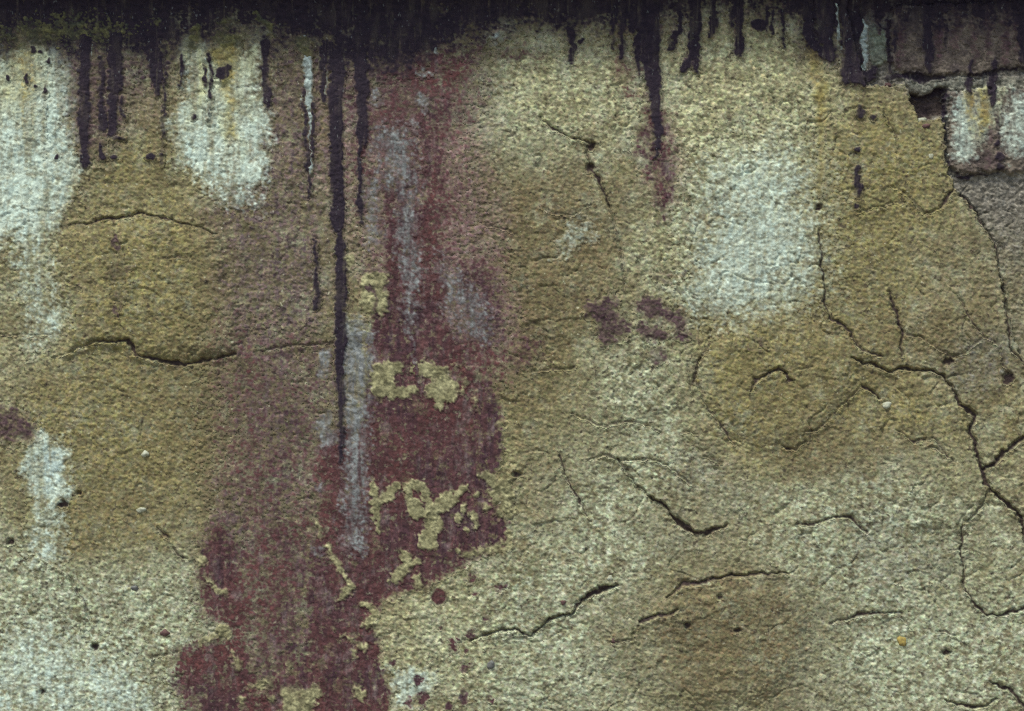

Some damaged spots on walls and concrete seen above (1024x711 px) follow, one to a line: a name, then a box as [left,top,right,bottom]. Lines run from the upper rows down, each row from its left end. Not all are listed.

leakage [0,31,137,363]
crack [72,210,218,236]
leakage [146,38,285,221]
corrosion [208,47,242,144]
leakage [565,22,579,67]
leakage [608,0,746,160]
leakage [798,0,1024,182]
spalling [866,22,1024,360]
crack [0,333,334,368]
crack [558,329,737,537]
crack [781,185,1024,618]
crack [469,583,620,642]